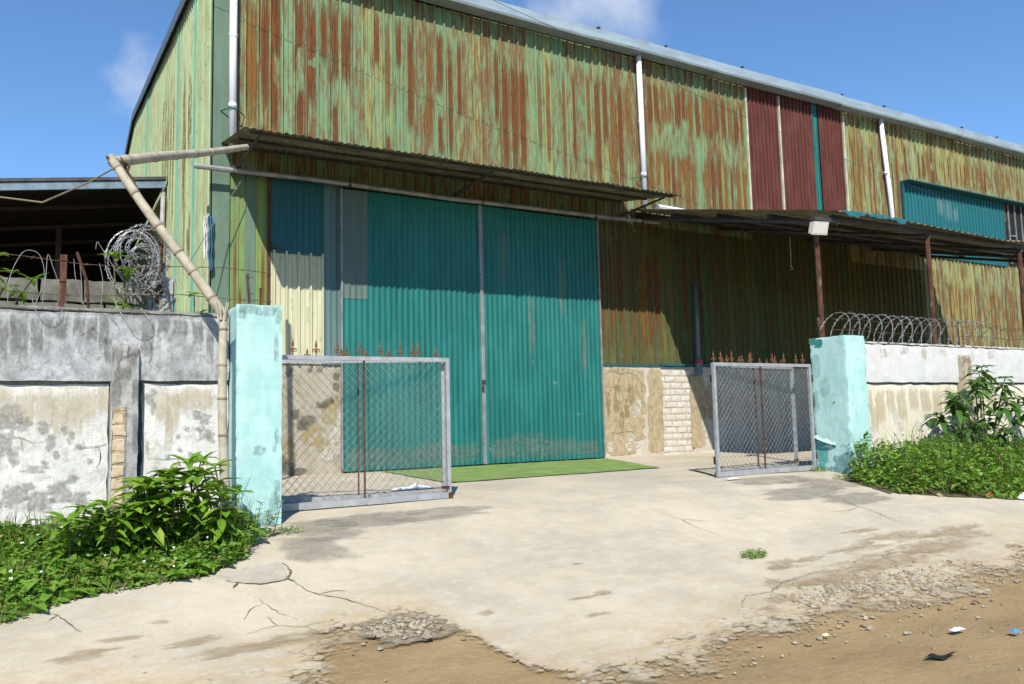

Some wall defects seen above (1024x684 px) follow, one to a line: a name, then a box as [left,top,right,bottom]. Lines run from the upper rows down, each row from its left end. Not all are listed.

rust [162,72,192,213]
rust [246,0,280,131]
rust [295,1,350,137]
rust [374,16,463,161]
rust [485,41,631,185]
rust [647,85,744,145]
rust [648,150,772,210]
rust [851,144,877,214]
rust [891,146,1024,219]
rust [600,244,662,347]
rust [940,283,1024,347]
crack [226,562,387,633]